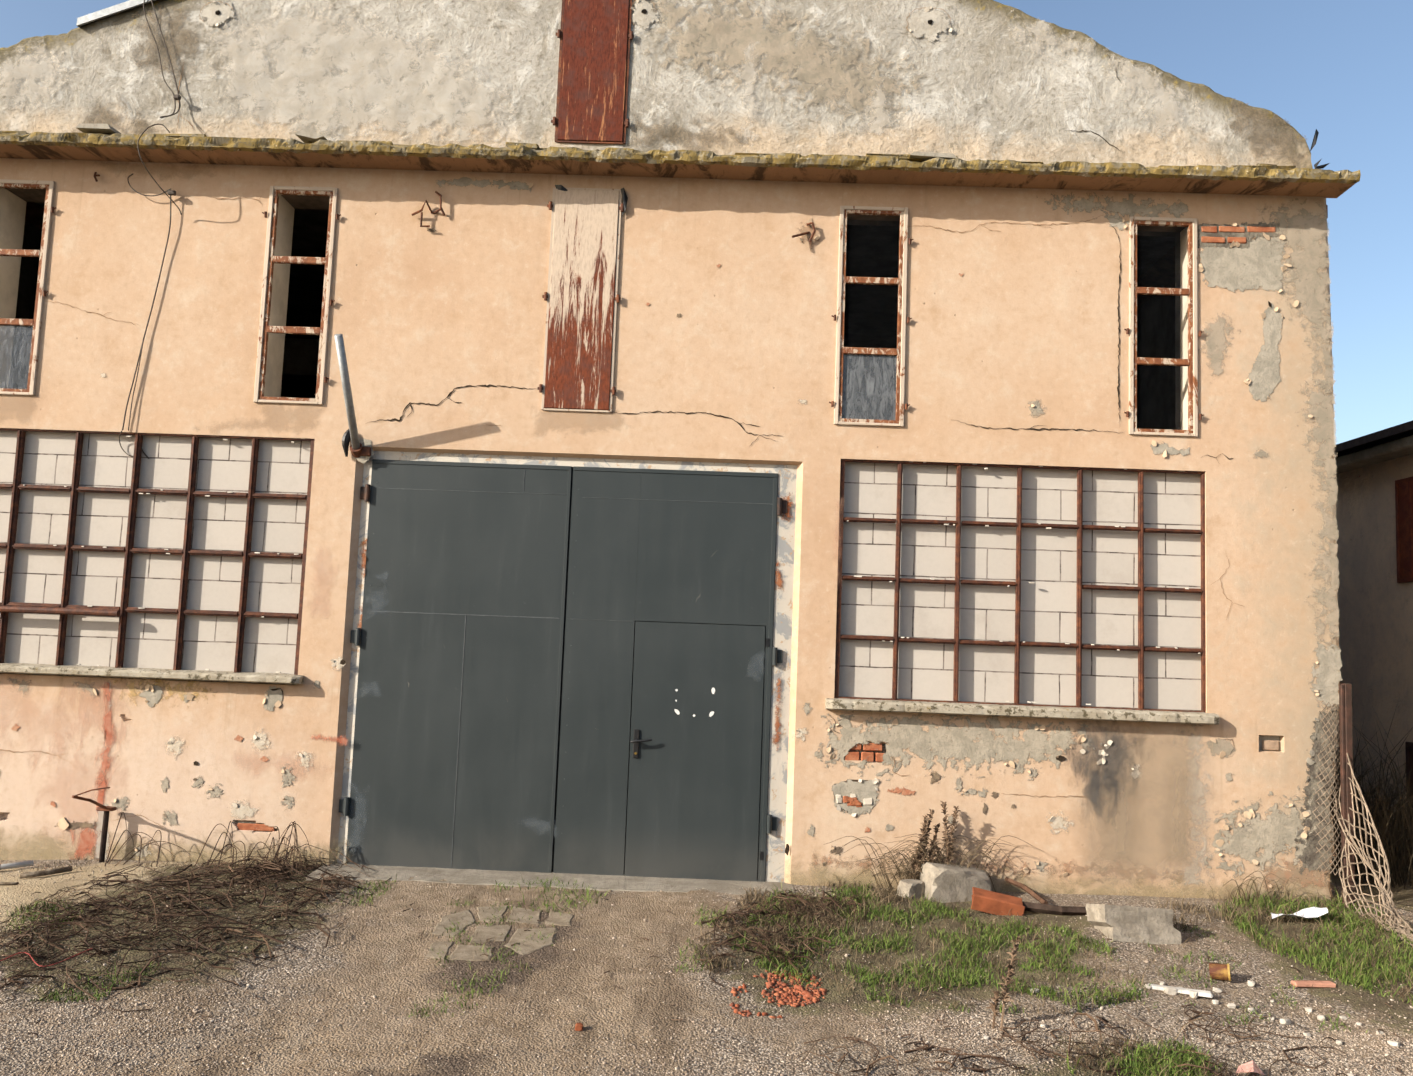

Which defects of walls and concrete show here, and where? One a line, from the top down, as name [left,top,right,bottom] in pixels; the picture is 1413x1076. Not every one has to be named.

peeling [1037,192,1189,231]
crack [372,384,536,422]
crack [616,411,780,446]
peeling [1150,440,1190,458]
peeling [1197,198,1343,892]
corrosion [71,682,115,860]
peeling [795,703,1113,834]
water stain [1089,735,1191,869]
peeling [813,845,884,869]
peeling [973,860,1184,883]